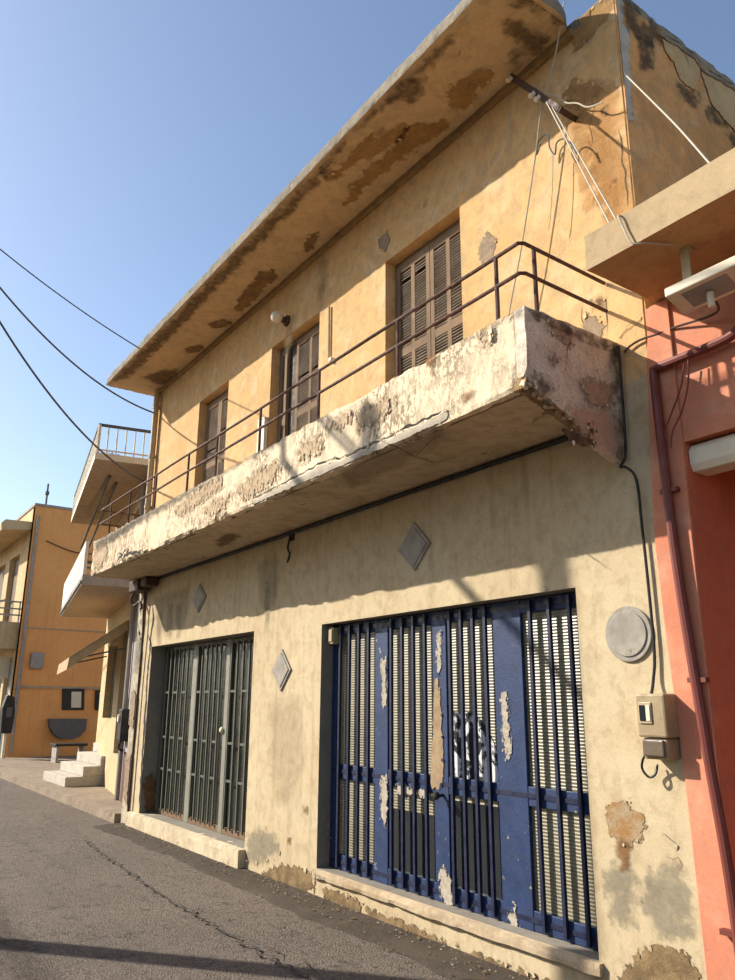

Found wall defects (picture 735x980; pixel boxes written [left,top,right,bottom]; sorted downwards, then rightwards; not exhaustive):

water stain [623,0,663,69]
crack [661,32,735,90]
peeling [325,69,494,206]
water stain [677,83,735,145]
peeling [478,232,497,265]
peeling [208,269,278,329]
peeling [545,298,606,368]
peeling [295,392,398,466]
spalling [513,372,597,448]
peeling [173,460,281,524]
peeling [605,800,647,870]
spalling [615,944,702,980]